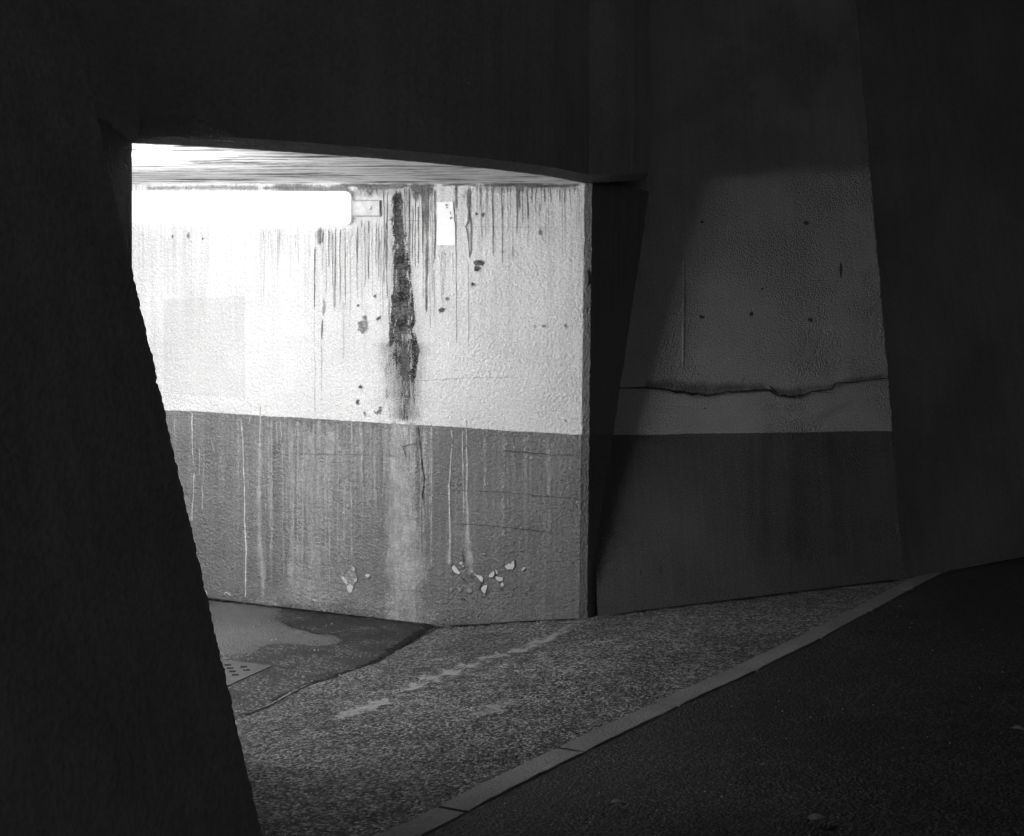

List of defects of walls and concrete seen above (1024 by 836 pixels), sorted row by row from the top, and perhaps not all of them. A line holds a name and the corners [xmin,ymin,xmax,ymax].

crack [619,378,886,398]
leakage [148,183,578,721]
peeling [341,565,370,593]
peeling [450,552,531,605]